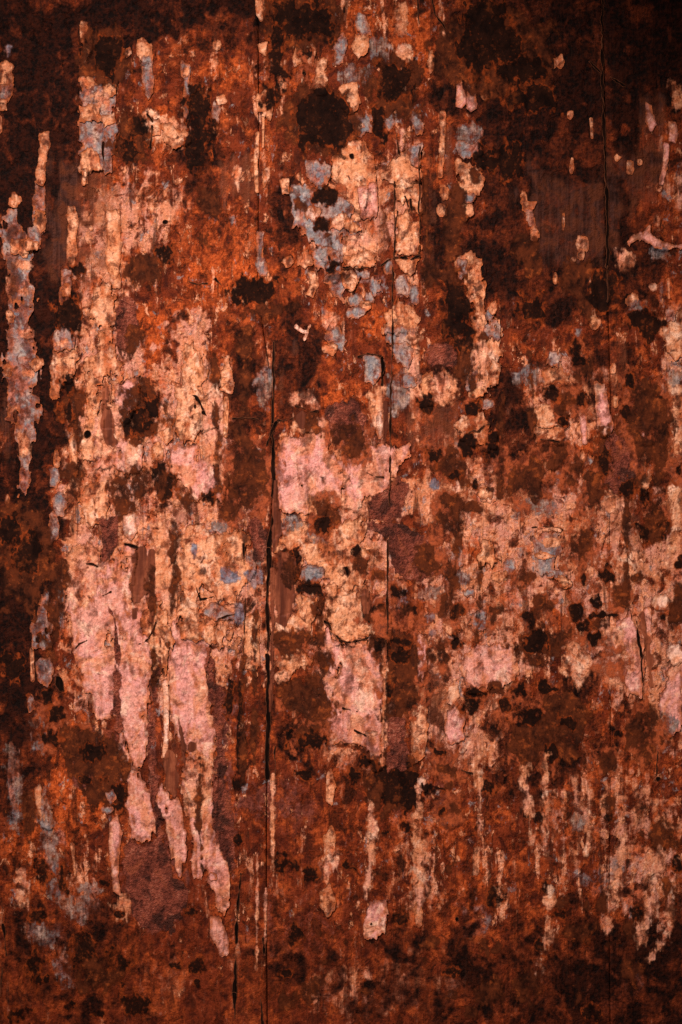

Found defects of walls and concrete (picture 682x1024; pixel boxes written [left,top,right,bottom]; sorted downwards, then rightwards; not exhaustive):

corrosion [258,0,563,161]
corrosion [118,377,176,447]
corrosion [101,460,216,523]
crack [196,341,319,780]
peeling [0,0,572,971]
corrosion [341,183,682,724]
corrosion [273,597,341,784]
corrosion [346,677,675,837]
peeling [13,862,72,986]
peeling [535,885,556,974]
peeling [600,835,628,935]
peeling [634,845,676,964]